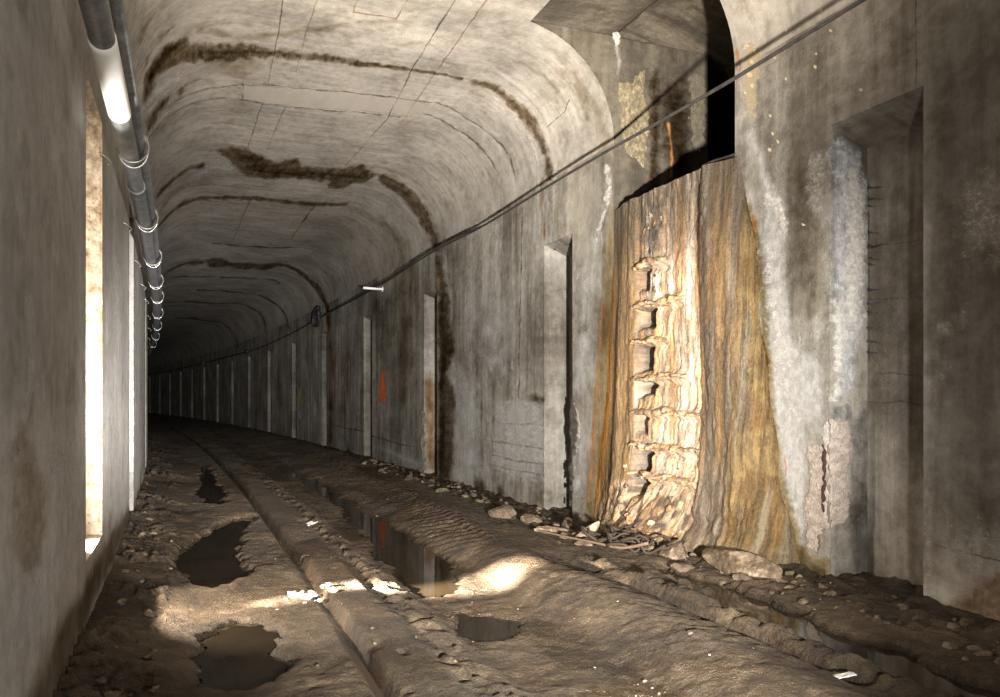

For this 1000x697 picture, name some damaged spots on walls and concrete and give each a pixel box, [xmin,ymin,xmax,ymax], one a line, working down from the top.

leakage [145,40,463,129]
leakage [475,78,556,205]
peeling [619,70,649,166]
leakage [190,148,490,489]
leakage [749,133,824,544]
spalling [803,419,853,554]